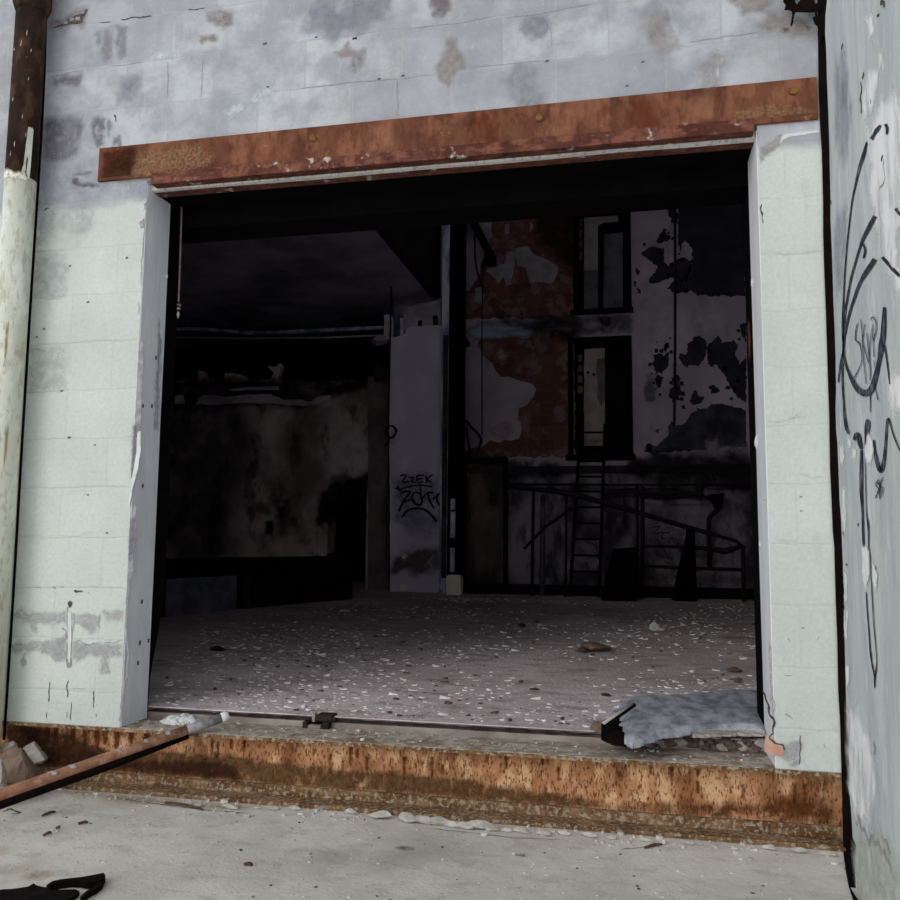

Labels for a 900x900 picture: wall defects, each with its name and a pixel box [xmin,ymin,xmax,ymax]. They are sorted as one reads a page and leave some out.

water stain [432,0,449,12]
water stain [92,118,110,147]
corrosion [102,148,209,178]
spalling [466,219,575,320]
peeling [641,204,745,297]
spalling [465,333,576,458]
peeling [644,323,747,458]
water stain [12,638,119,673]
water stain [16,611,122,633]
spalling [762,691,800,766]
crack [769,638,801,764]
corrosion [681,800,830,819]